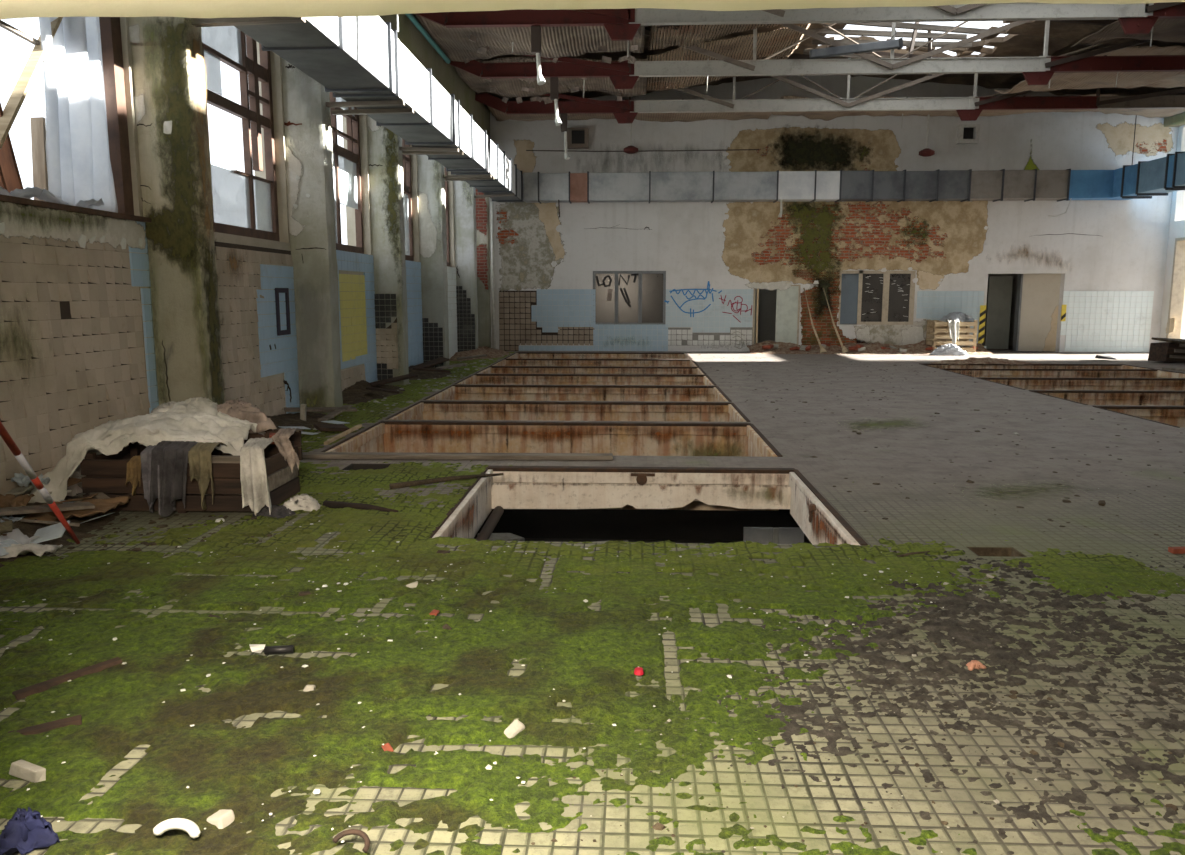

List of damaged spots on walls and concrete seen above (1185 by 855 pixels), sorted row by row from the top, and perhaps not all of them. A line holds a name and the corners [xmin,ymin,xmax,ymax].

flaking render [1097,121,1173,161]
flaking render [0,201,146,249]
flaking render [476,189,571,292]
flaking render [719,201,988,345]
rust [391,369,611,448]